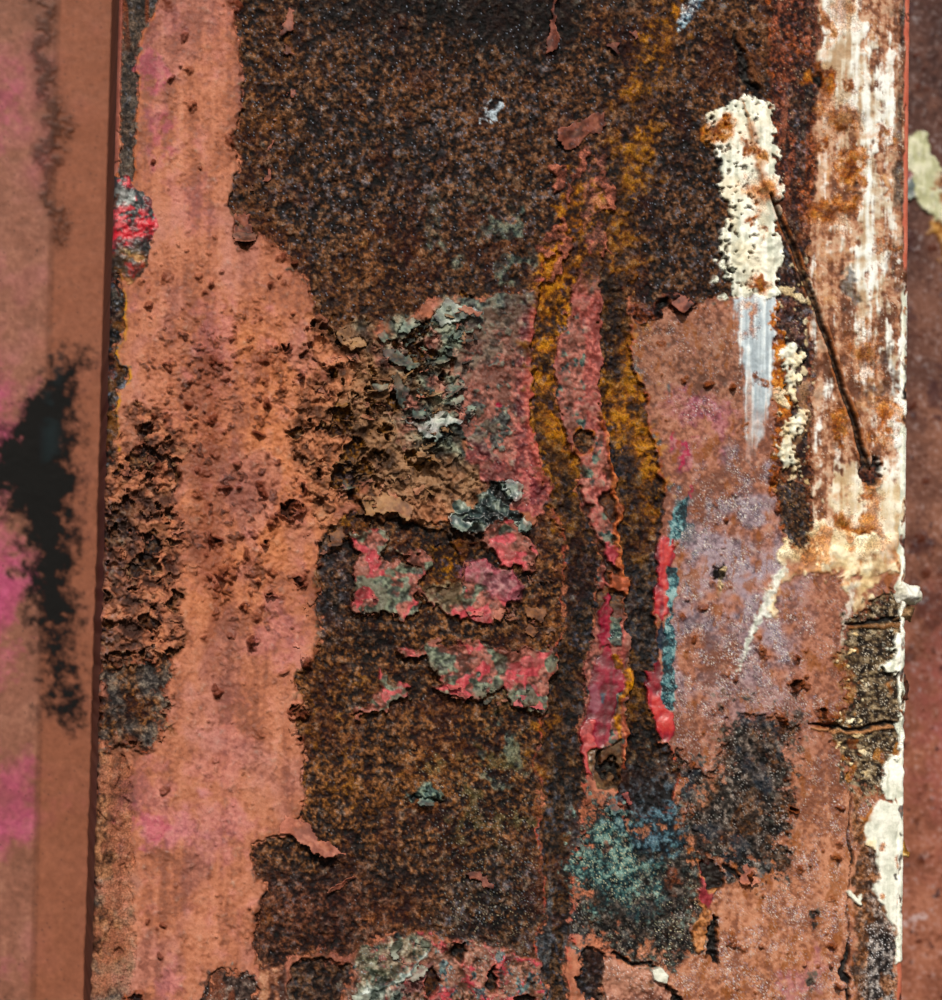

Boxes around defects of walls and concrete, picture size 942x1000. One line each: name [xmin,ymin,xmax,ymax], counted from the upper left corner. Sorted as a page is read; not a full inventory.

rust [223,0,942,568]
peeling [349,285,554,625]
rust [226,590,284,653]
rust [250,504,568,973]
peeling [287,930,548,1000]
peeling [396,638,559,716]
spalling [554,256,803,1000]
rust [775,709,791,728]
rust [786,804,801,815]
crack [838,790,855,1000]
crack [808,720,904,733]
spalling [828,588,906,1000]